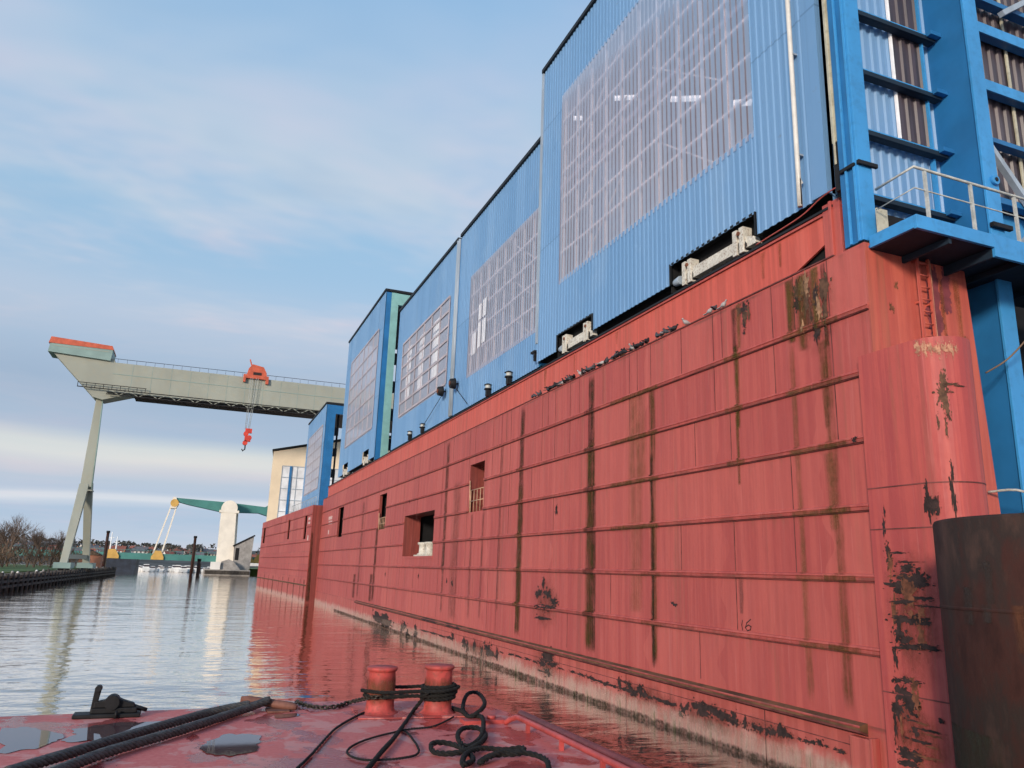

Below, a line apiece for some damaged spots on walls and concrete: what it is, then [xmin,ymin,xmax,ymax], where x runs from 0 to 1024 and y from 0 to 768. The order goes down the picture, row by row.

peeling [914,264,965,436]
peeling [923,458,958,525]
peeling [882,540,945,768]